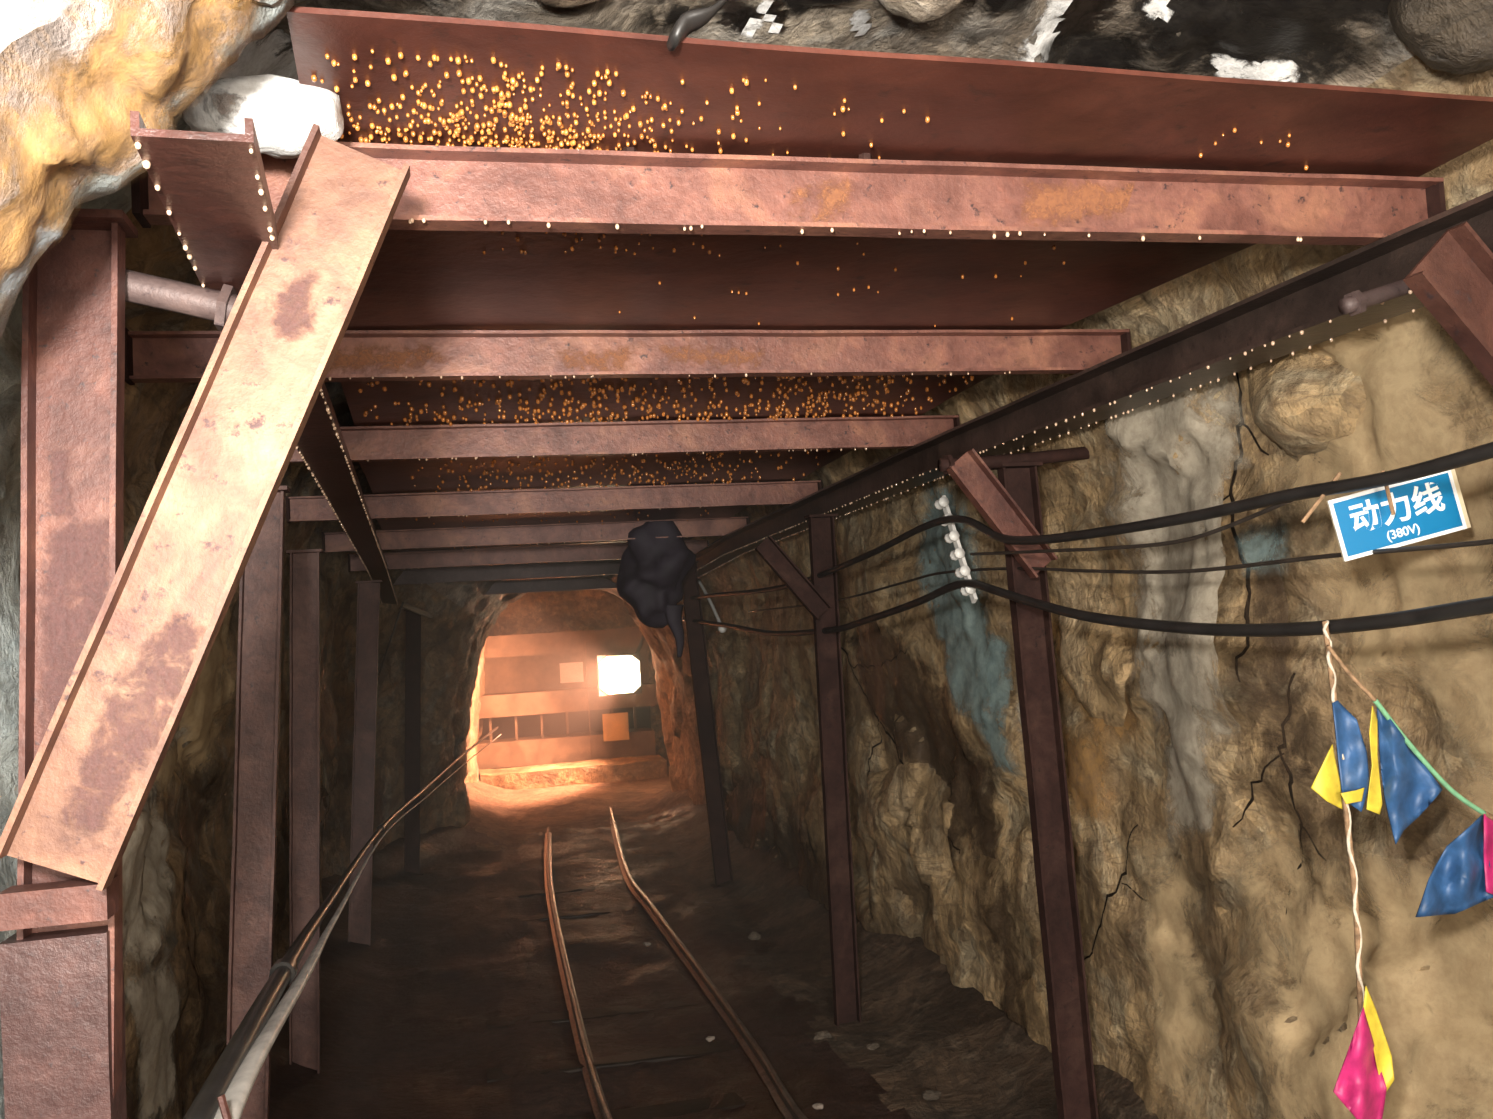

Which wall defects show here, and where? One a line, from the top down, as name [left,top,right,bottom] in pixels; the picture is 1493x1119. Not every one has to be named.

rust [275,274,315,337]
rust [1024,182,1134,225]
rust [63,615,198,831]
crack [1233,673,1327,914]